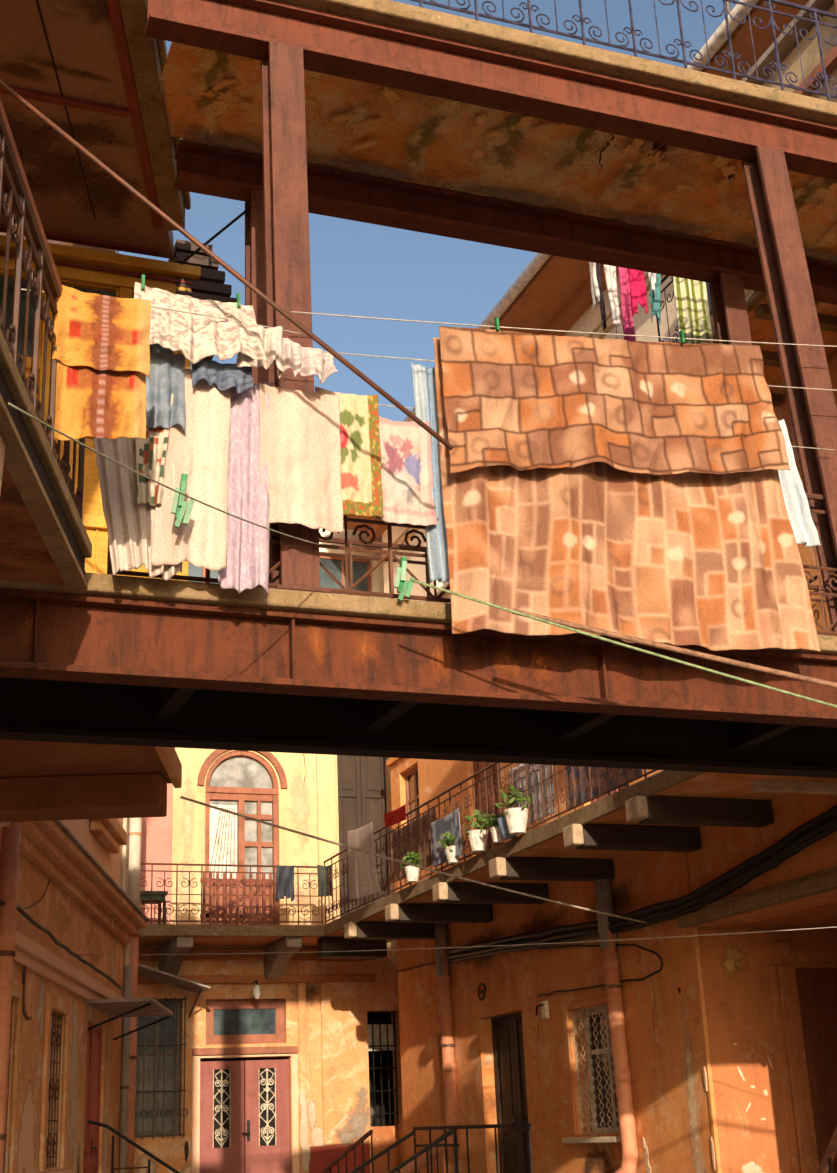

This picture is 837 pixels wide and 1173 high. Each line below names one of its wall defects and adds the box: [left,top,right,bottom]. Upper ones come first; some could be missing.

leakage [8,114,138,219]
corrosion [309,629,325,662]
peeling [740,1160,763,1173]